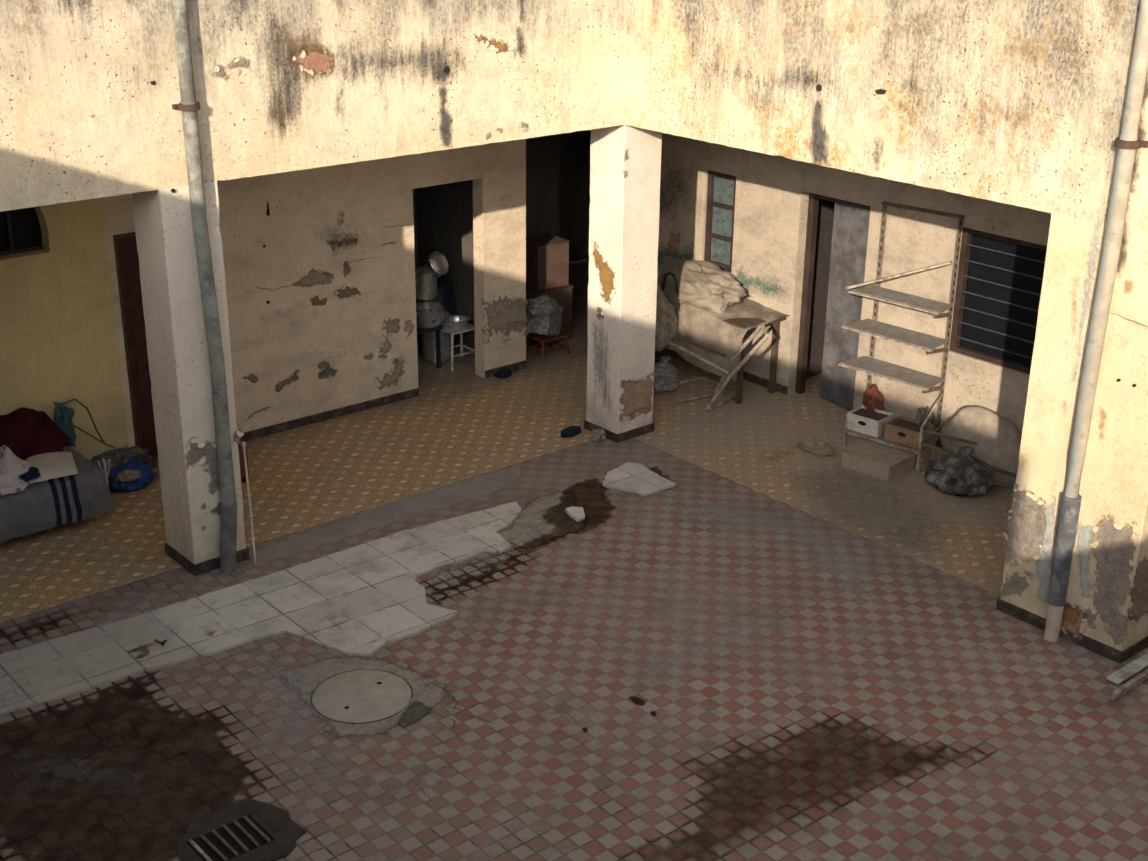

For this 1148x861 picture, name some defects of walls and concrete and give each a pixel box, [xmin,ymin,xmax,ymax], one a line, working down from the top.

water stain [267,19,301,133]
spalling [286,38,334,78]
water stain [343,42,463,146]
water stain [782,72,828,163]
peeling [256,261,361,306]
peeling [482,295,532,344]
peeling [593,242,616,321]
spalling [619,373,653,422]
peeling [999,484,1047,597]
peeling [1060,515,1148,647]
water stain [0,671,275,861]
water stain [695,715,958,827]